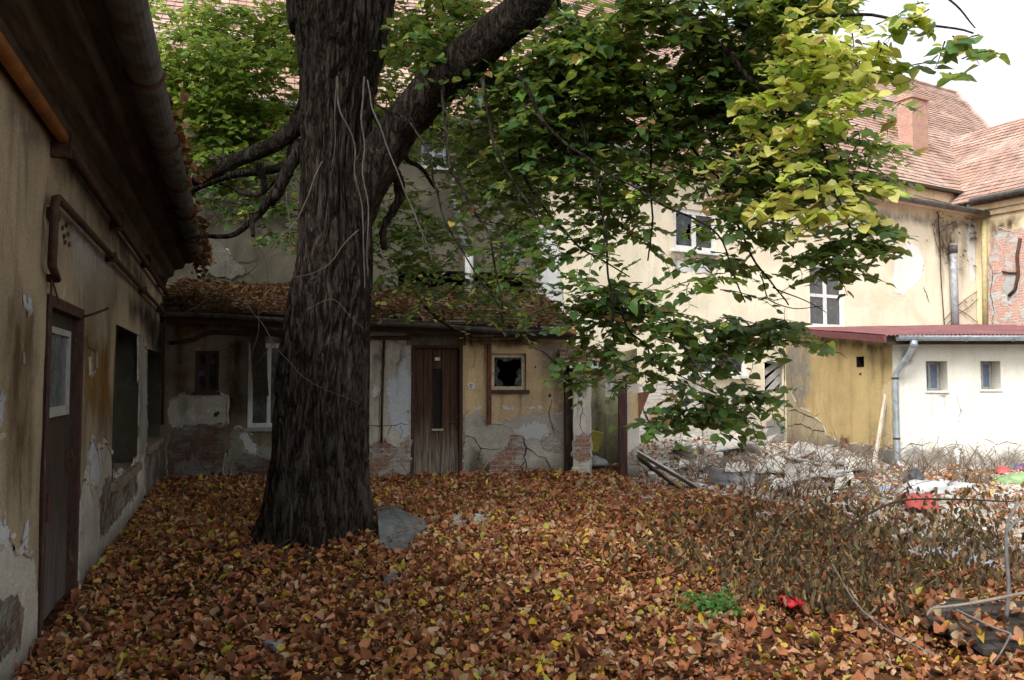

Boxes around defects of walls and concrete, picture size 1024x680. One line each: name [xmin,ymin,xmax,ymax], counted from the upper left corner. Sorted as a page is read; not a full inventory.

flaking render [966,204,1024,336]
leakage [11,328,31,460]
flaking render [78,332,160,591]
flaking render [166,391,272,476]
peeling [369,340,415,478]
crack [466,401,585,470]
flaking render [462,367,593,474]
flaking render [0,507,44,680]